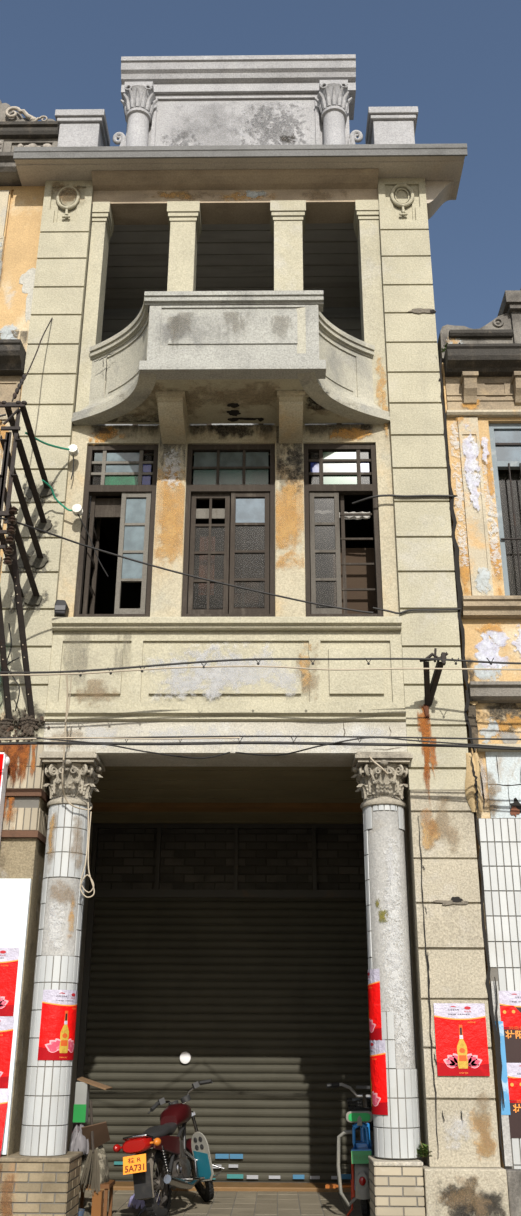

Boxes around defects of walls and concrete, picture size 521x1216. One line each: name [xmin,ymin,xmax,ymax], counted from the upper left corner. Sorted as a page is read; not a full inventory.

water stain [89,358,388,561]
peeling [450,425,501,593]
peeling [467,624,521,681]
corrosion [418,704,437,789]
water stain [441,1178,505,1216]